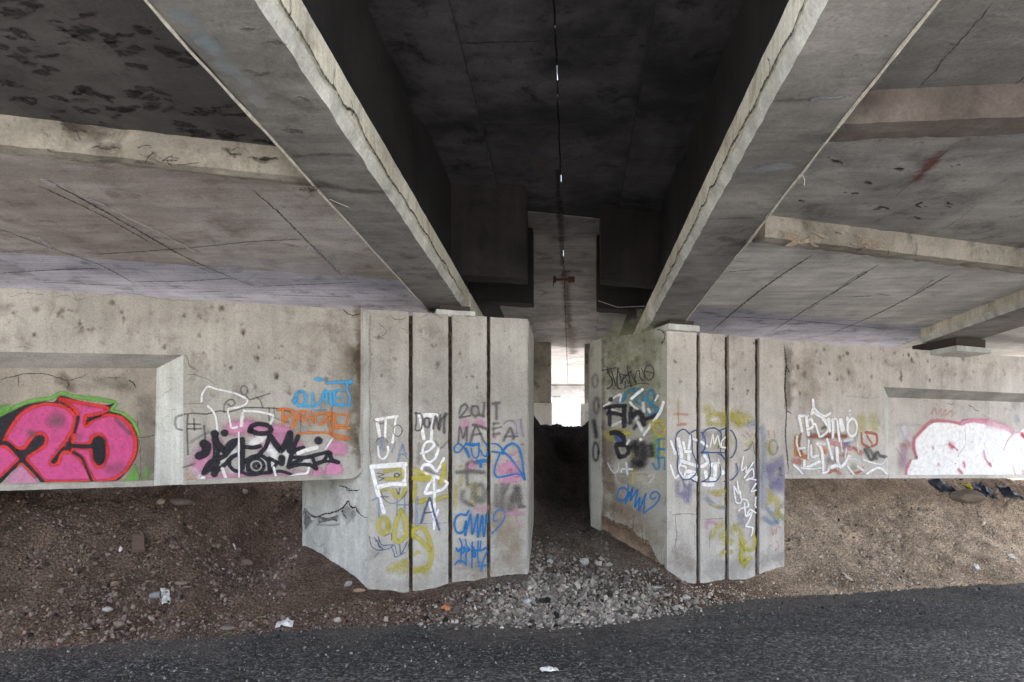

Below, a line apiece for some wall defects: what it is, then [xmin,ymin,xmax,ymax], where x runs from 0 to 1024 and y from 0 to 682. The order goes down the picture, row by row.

crack [1,0,480,555]
crack [657,0,805,296]
crack [713,232,950,471]
crack [922,3,993,85]